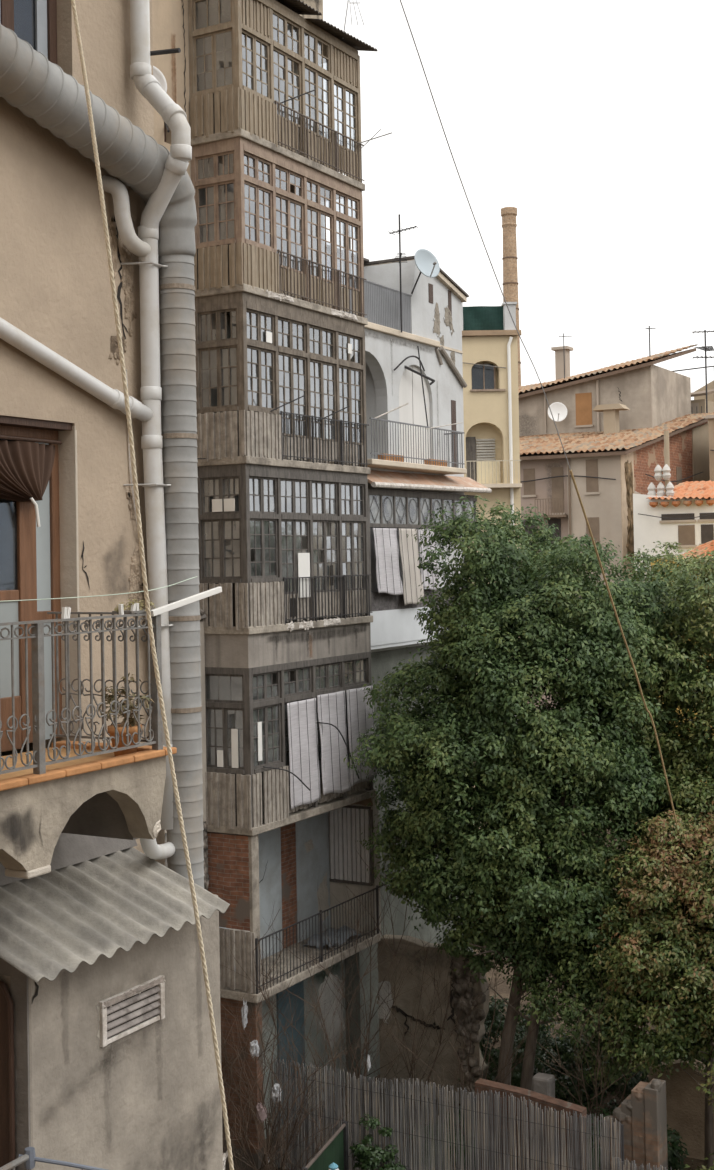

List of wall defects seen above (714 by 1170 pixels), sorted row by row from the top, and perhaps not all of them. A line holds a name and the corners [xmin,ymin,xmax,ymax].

spalling [108,215,137,365]
crack [392,960,461,1046]